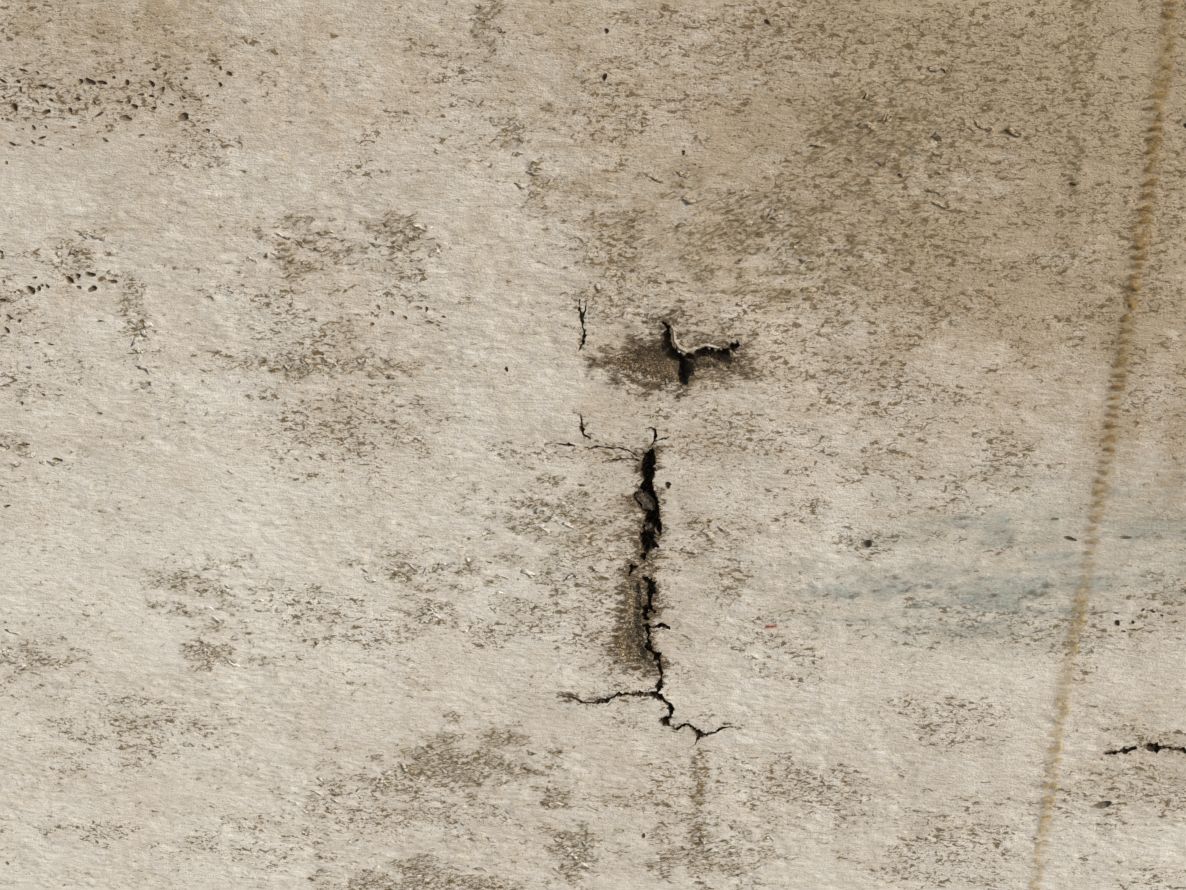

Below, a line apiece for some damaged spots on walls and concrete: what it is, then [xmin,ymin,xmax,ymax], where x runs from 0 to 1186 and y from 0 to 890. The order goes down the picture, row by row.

corrosion [1092,91,1168,529]
crack [556,413,741,748]
crack [1105,740,1186,755]